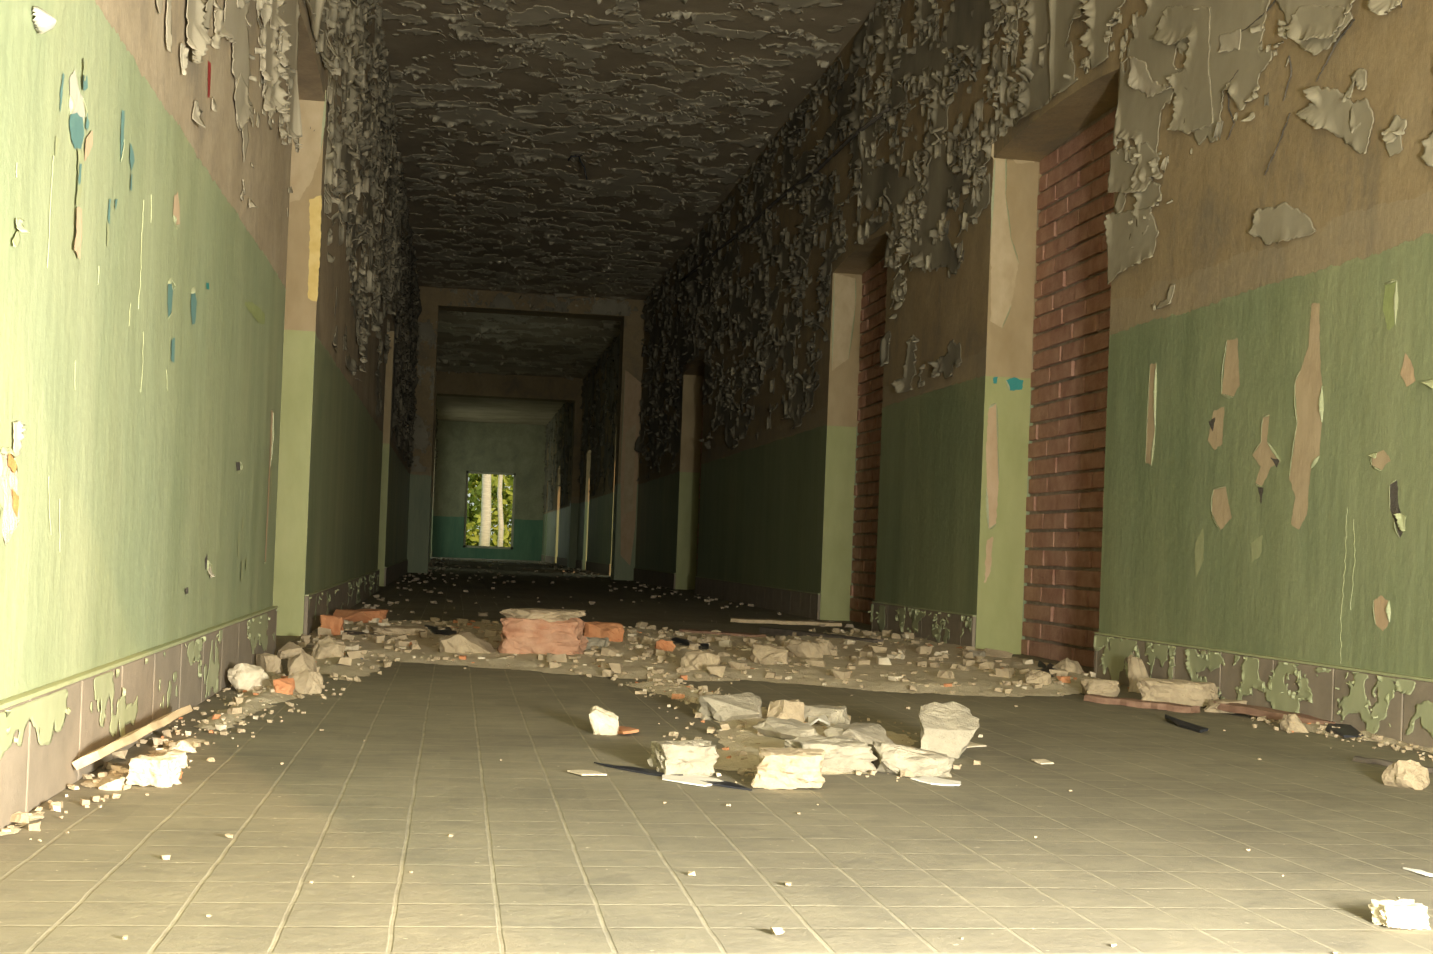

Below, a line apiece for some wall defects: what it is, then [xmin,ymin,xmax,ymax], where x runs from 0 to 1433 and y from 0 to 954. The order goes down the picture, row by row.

peeling [55,57,93,259]
peeling [107,110,135,246]
peeling [1421,132,1433,167]
peeling [156,0,1407,583]
peeling [1400,353,1433,389]
peeling [0,421,26,545]
peeling [0,689,71,760]
peeling [90,669,138,737]
peeling [159,630,223,708]
peeling [247,609,279,654]
peeling [1093,635,1433,738]
peeling [1372,595,1391,631]